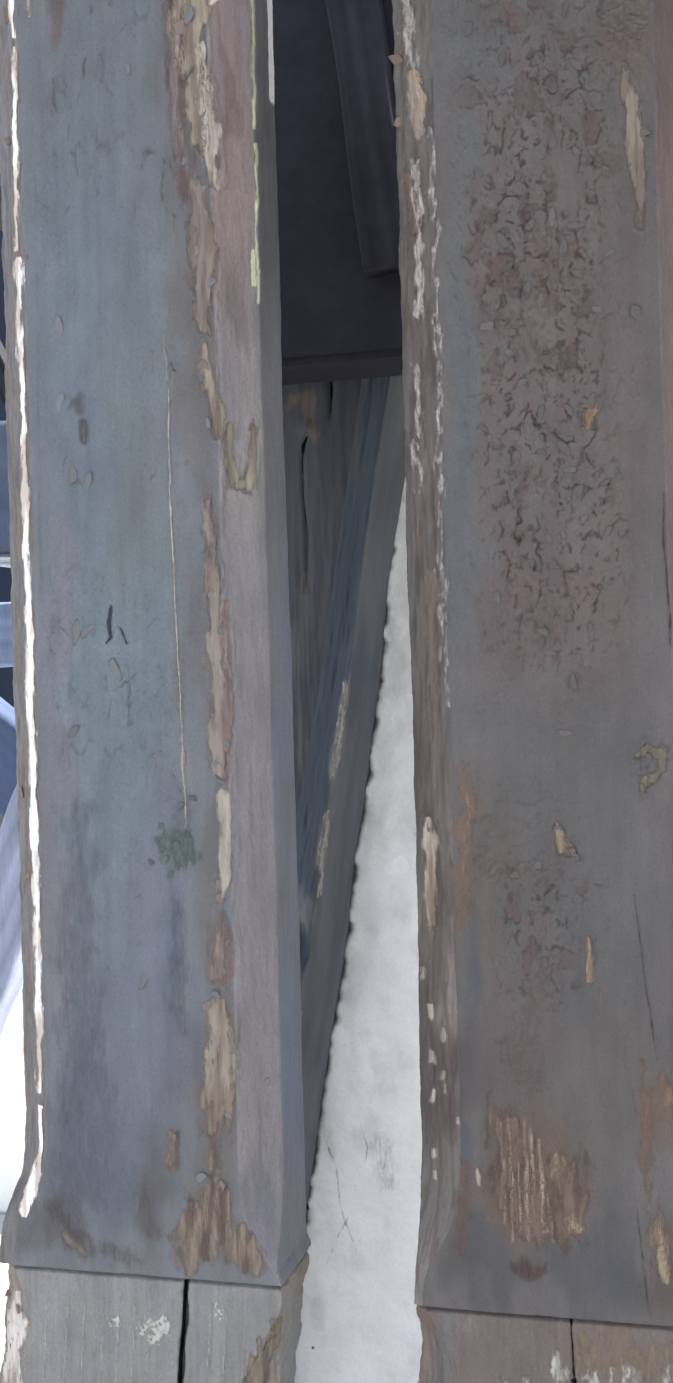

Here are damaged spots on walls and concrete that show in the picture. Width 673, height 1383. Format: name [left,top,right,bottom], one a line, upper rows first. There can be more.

peeling [620,64,651,228]
peeling [163,0,257,491]
peeling [4,0,44,1218]
peeling [167,498,263,1277]
peeling [476,1100,589,1253]
peeling [646,1200,673,1284]
peeling [1,1289,47,1383]
peeling [99,1305,170,1383]
crack [178,1279,188,1383]
peeling [550,1350,569,1383]
crack [569,1319,577,1383]
peeling [587,1366,639,1383]